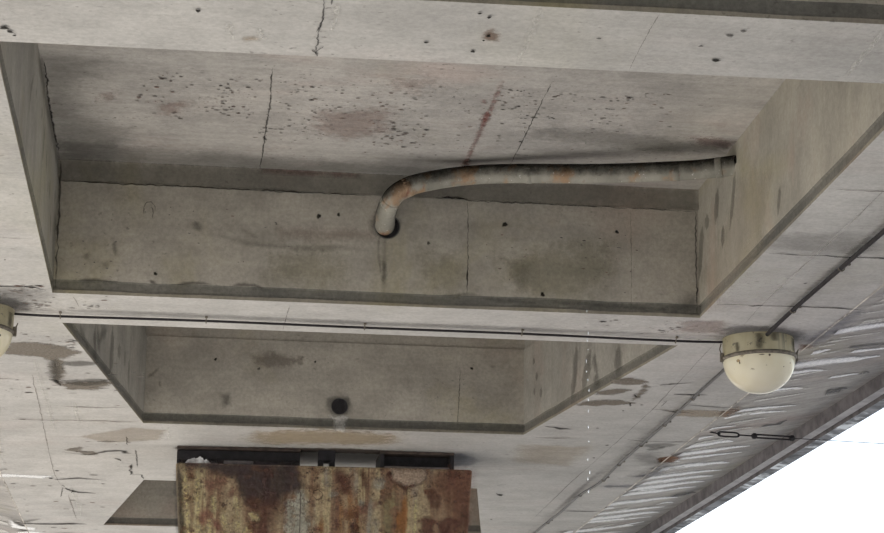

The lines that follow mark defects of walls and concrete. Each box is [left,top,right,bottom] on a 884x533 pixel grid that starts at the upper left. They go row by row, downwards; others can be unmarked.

crack [312,0,333,56]
crack [0,63,370,290]
rust [176,460,469,533]